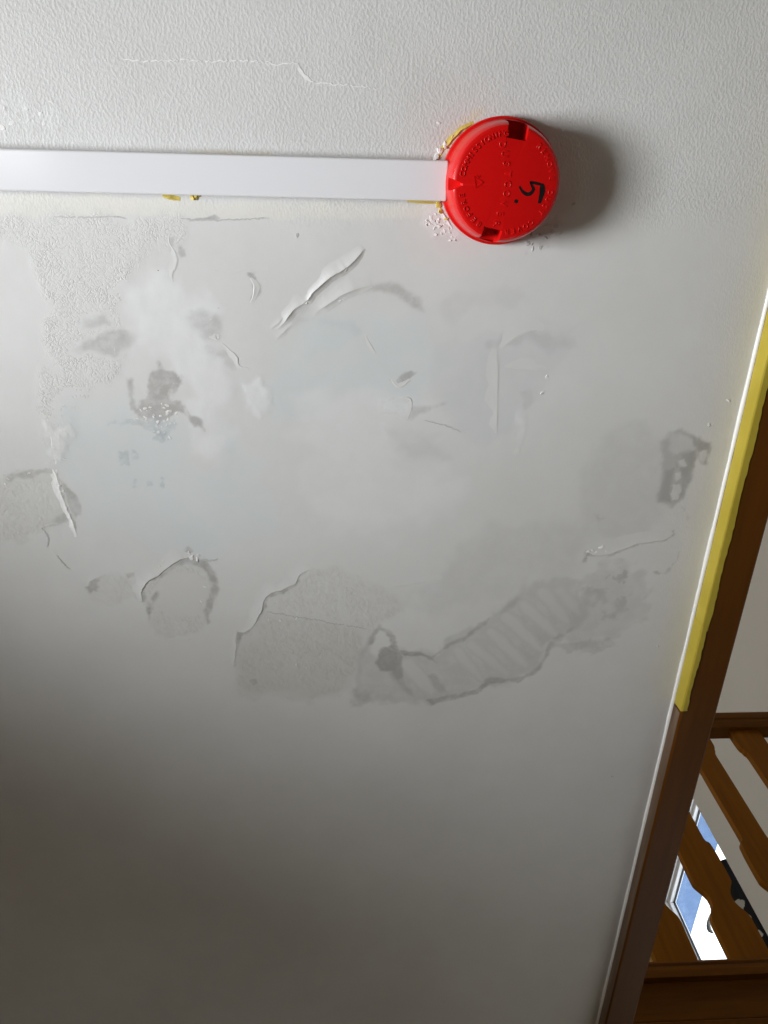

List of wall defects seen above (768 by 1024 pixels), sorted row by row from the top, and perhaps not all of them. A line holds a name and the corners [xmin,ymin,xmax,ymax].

leakage [181,305,249,374]
leakage [338,276,544,331]
flaking render [105,358,208,444]
peeling [0,458,84,548]
flaking render [132,544,224,646]
leakage [346,412,714,711]